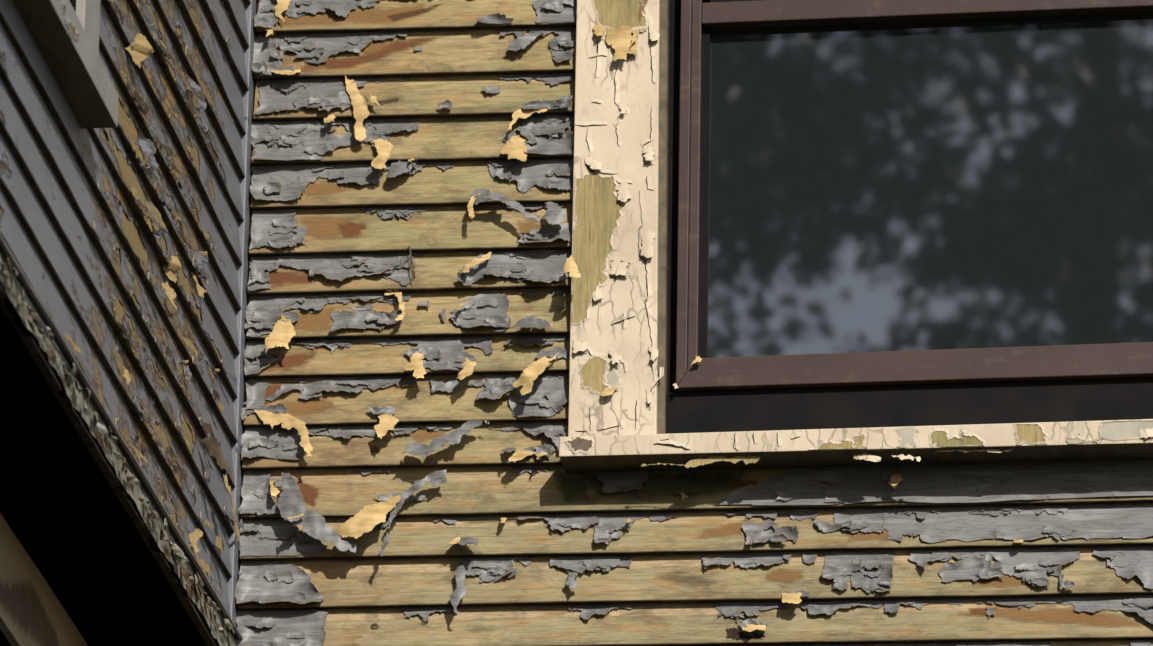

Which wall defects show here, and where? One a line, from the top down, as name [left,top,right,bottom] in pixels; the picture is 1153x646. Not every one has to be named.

peeling [591,0,660,61]
peeling [643,146,655,161]
crack [572,6,691,450]
peeling [639,229,657,258]
peeling [0,0,632,646]
crack [733,432,800,451]
peeling [400,420,1153,640]